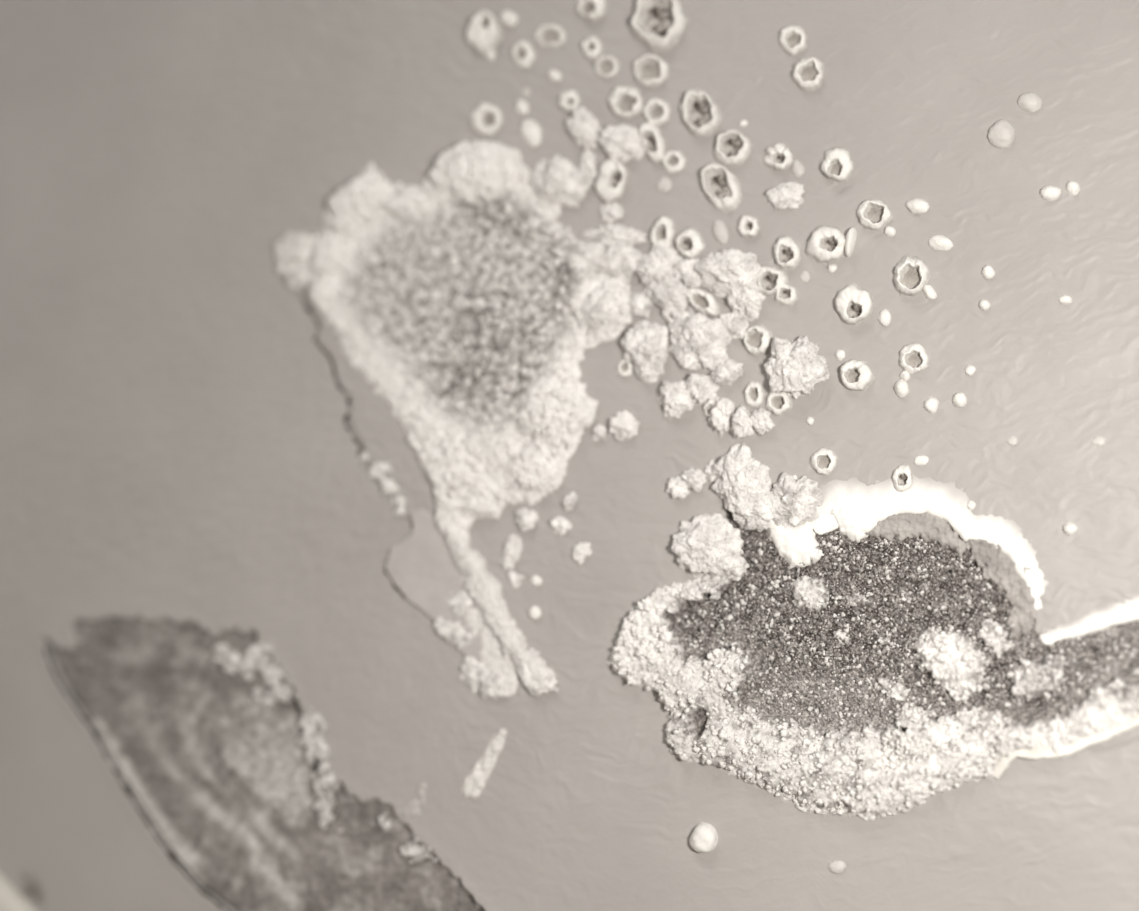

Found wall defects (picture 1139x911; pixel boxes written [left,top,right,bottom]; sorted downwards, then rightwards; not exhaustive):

peeling [44,616,485,911]
crack [298,290,378,485]
crack [384,519,413,599]
efflorescence [273,140,633,700]
spalling [606,443,1139,821]